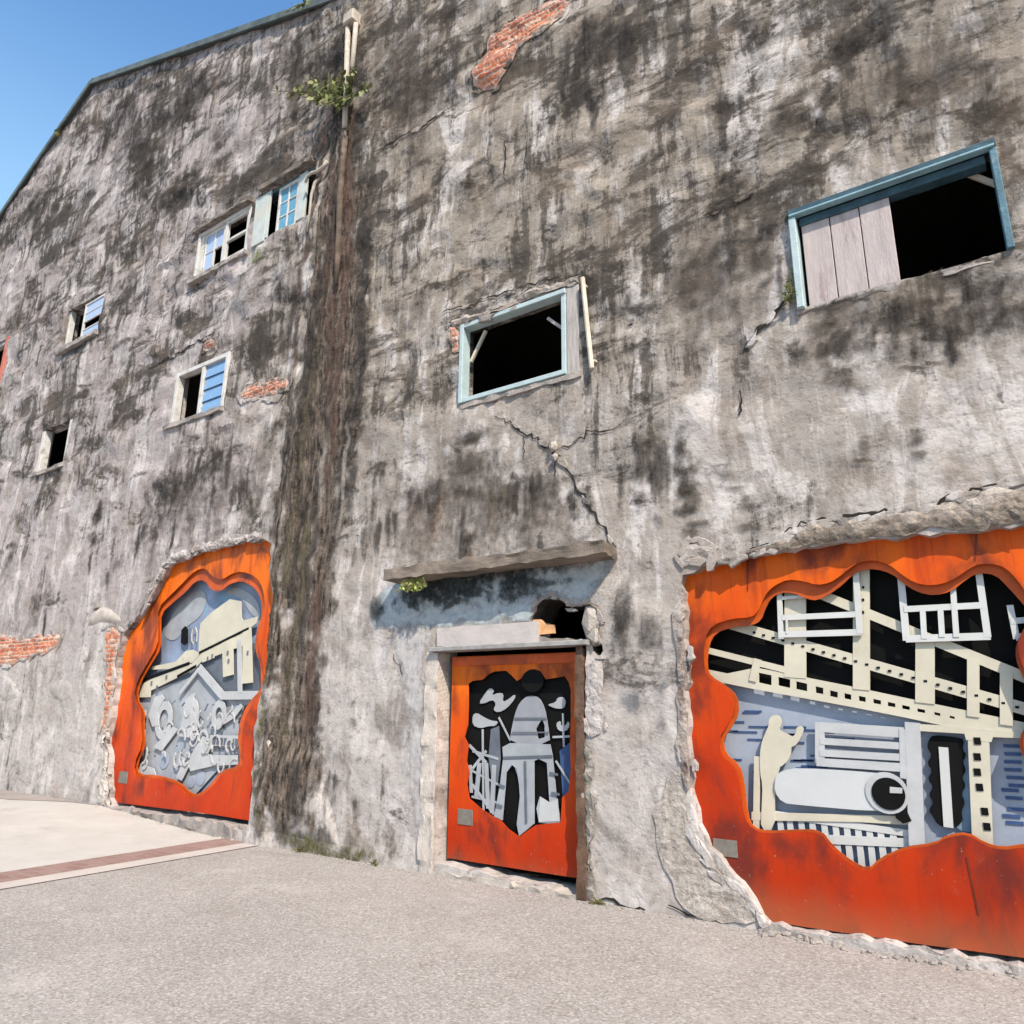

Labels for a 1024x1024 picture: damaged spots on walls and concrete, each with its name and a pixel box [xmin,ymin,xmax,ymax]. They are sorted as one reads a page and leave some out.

flaking render [465,0,573,94]
crack [374,105,454,152]
flaking render [446,276,579,354]
crack [743,301,786,350]
damp [810,296,918,359]
damp [928,268,1024,363]
damp [252,21,375,845]
damp [134,449,253,556]
crack [495,416,627,547]
flaking render [0,627,63,669]
flaking render [97,627,124,806]
peeling [370,560,611,900]